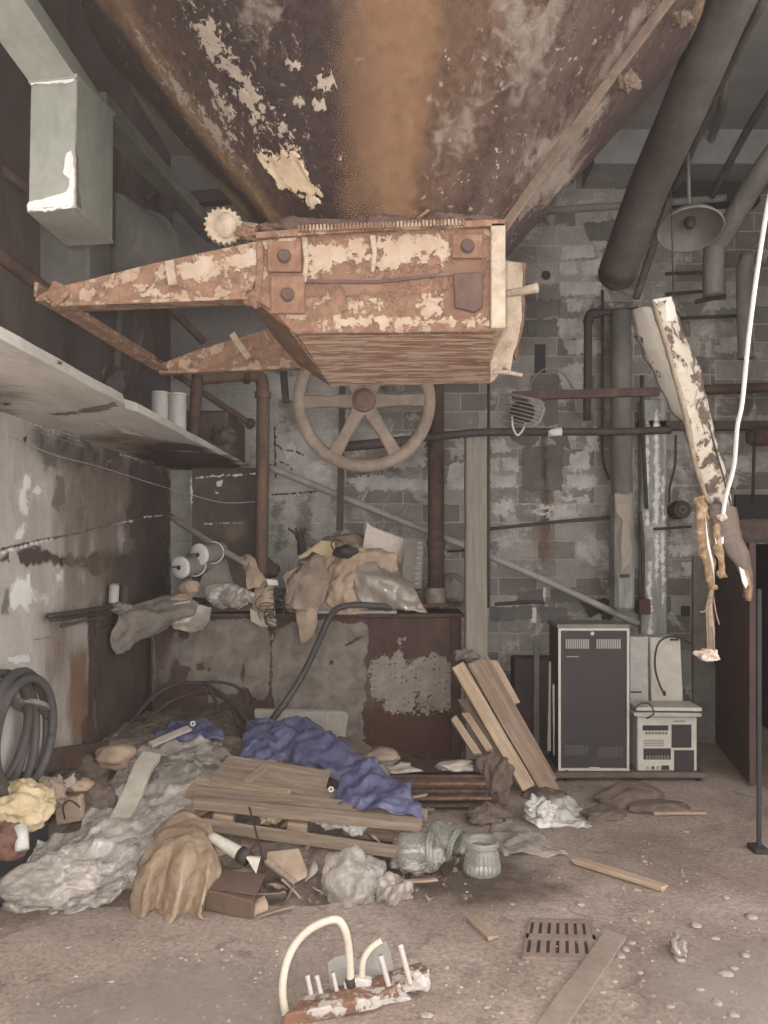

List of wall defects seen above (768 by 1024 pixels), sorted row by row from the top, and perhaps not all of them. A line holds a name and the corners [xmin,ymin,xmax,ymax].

corrosion [540,436,551,561]
water stain [1,423,245,744]
peeling [152,618,451,740]
corrosion [370,706,451,759]